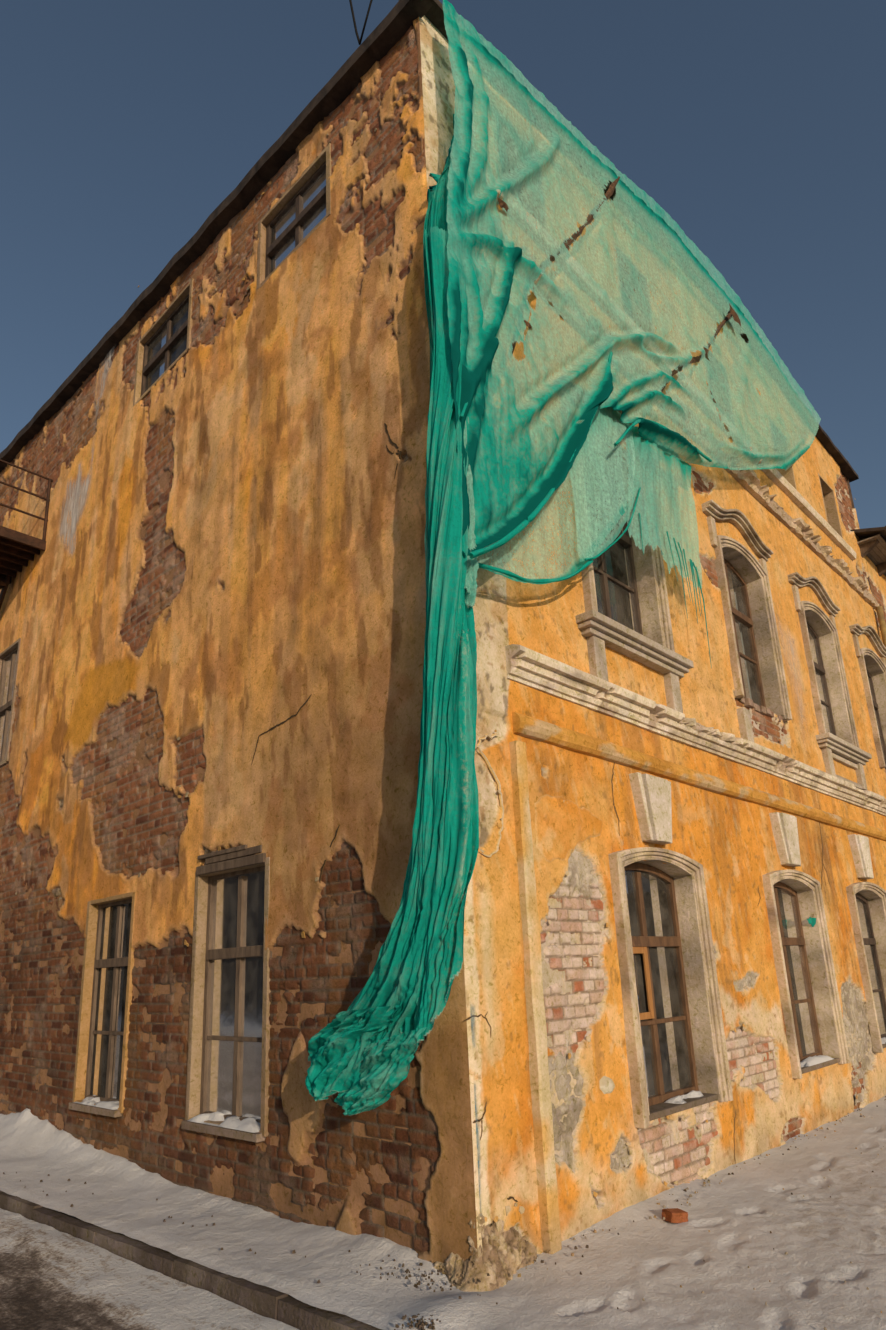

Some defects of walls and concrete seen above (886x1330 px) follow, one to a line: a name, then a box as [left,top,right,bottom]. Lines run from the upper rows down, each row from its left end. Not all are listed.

flaking render [322,25,425,287]
flaking render [0,153,299,657]
spalling [835,471,856,532]
crack [251,694,312,765]
spalling [734,696,787,744]
flaking render [0,686,538,1292]
spalling [540,849,609,1170]
peeling [733,972,757,990]
spalling [726,1023,779,1100]
spalling [841,977,877,1109]
spalling [610,1101,718,1186]